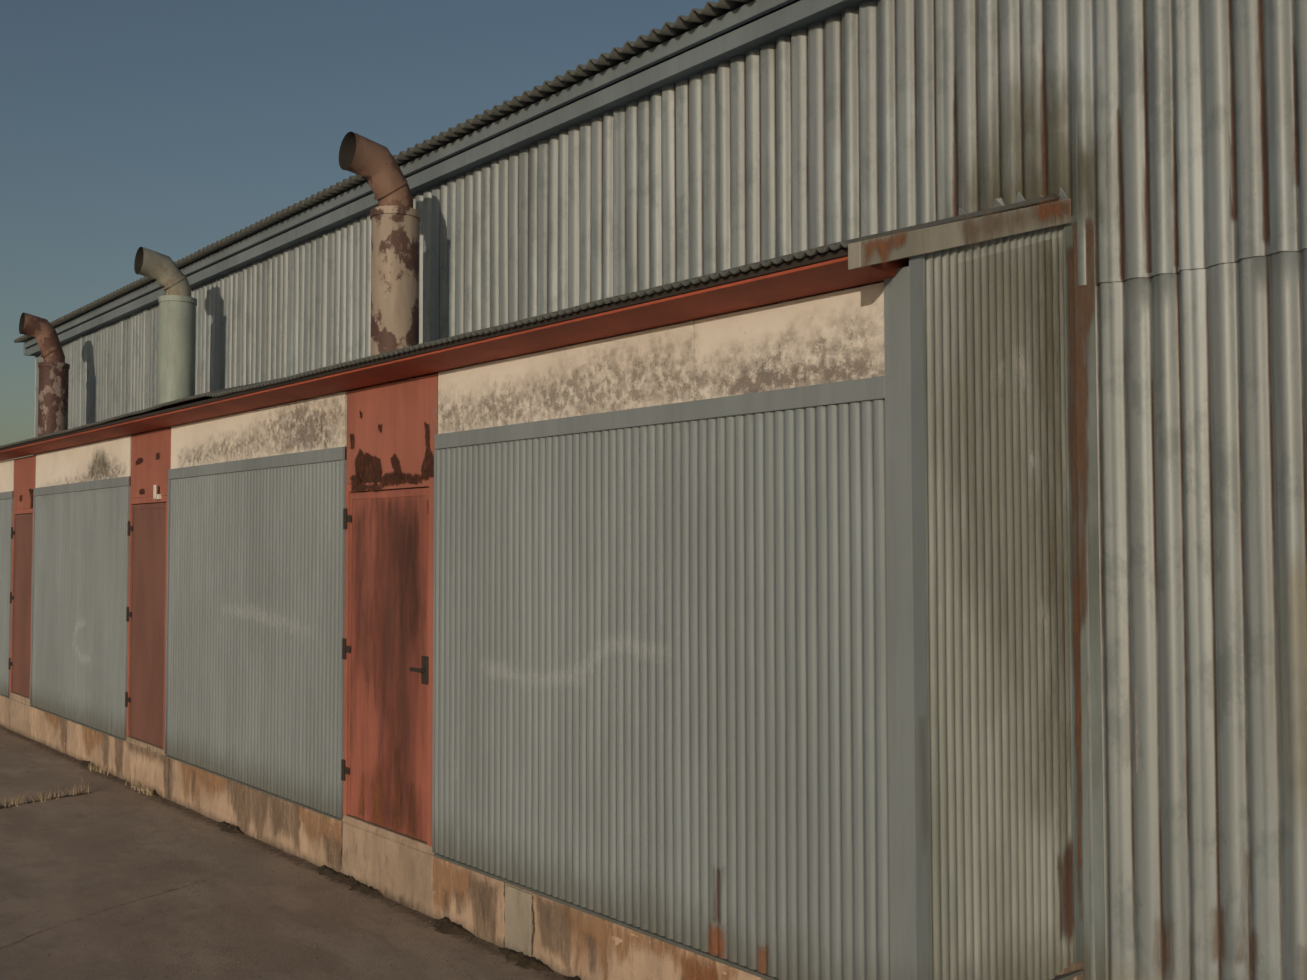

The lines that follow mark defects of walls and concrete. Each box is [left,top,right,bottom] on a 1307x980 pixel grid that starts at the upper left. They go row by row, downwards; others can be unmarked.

leakage [438,332,871,430]
leakage [187,400,344,462]
corrosion [954,83,1094,941]
crack [0,792,91,809]
leakage [0,725,341,882]
leakage [360,890,439,924]
leakage [454,880,570,980]